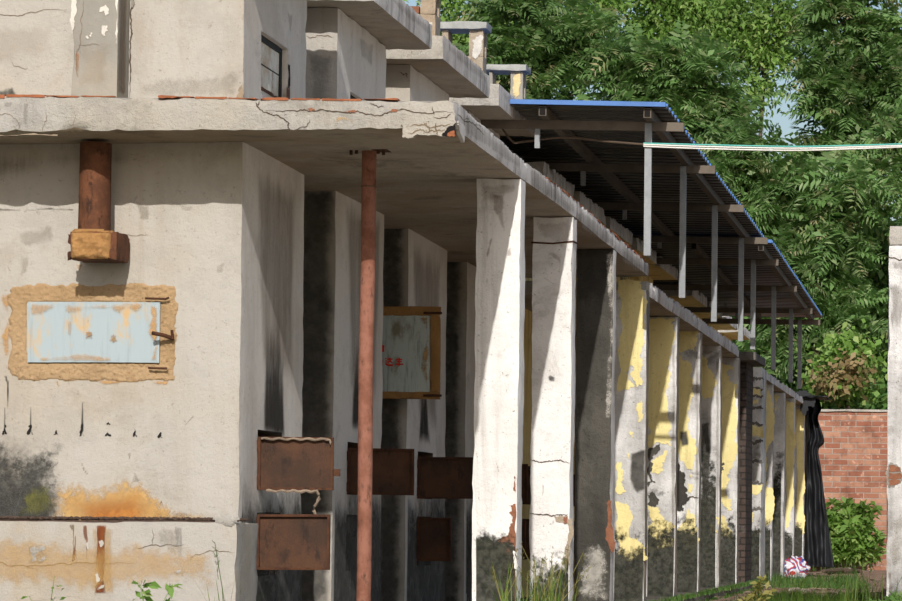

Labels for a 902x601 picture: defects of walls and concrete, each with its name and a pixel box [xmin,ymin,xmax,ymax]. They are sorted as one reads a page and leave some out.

crack [75,1,98,73]
crack [127,7,135,98]
peeling [472,35,483,59]
crack [256,101,484,135]
water stain [302,191,331,437]
rust [58,482,169,593]
water stain [300,490,327,514]
water stain [301,570,326,601]
spalling [499,504,518,601]
peeling [605,279,738,561]
water stain [614,423,736,601]
peeling [752,384,805,535]